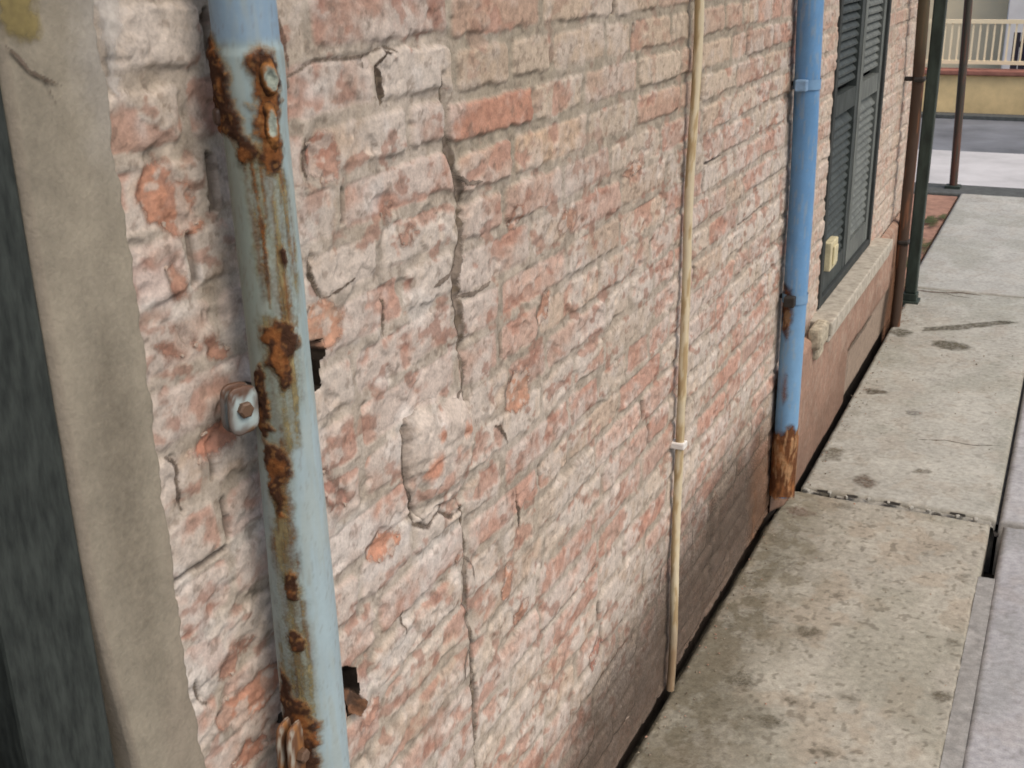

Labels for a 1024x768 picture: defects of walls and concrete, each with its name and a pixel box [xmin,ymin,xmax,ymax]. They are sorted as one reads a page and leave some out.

crack [279,22,397,105]
crack [434,130,490,401]
rust [206,35,323,768]
rust [769,426,799,500]
crack [400,432,477,768]